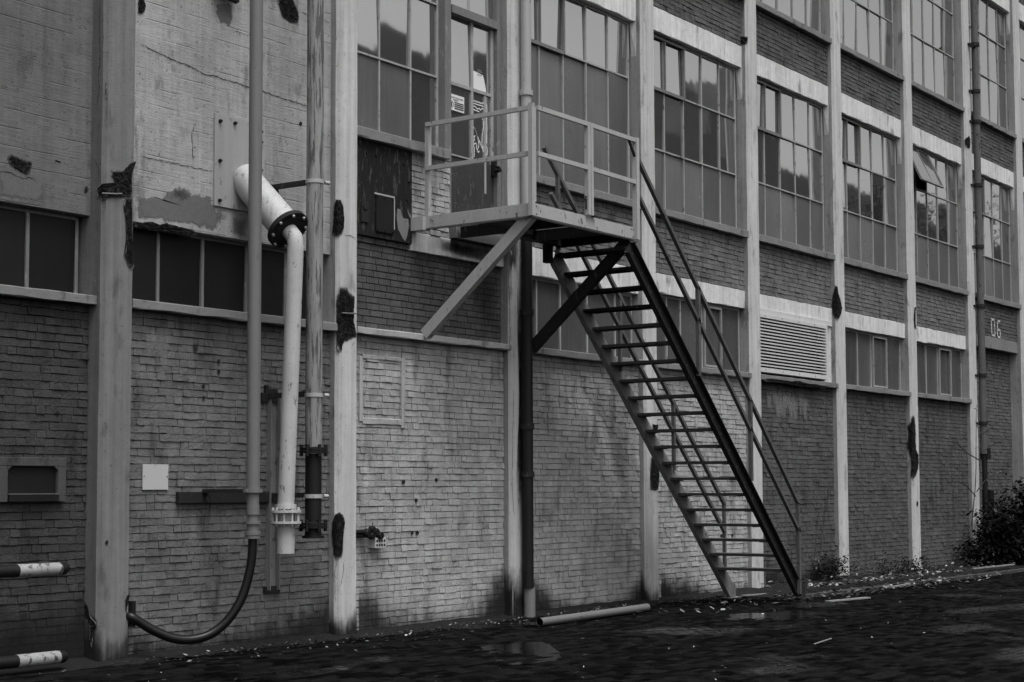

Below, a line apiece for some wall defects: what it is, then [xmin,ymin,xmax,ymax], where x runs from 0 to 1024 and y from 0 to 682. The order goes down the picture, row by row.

spalling [278,0,299,23]
crack [142,45,306,106]
spalling [7,155,32,173]
spalling [96,162,197,269]
spalling [332,199,345,236]
spalling [336,287,356,352]
spalling [832,285,842,318]
spalling [907,415,919,478]
spalling [650,457,659,490]
spalling [331,513,345,559]